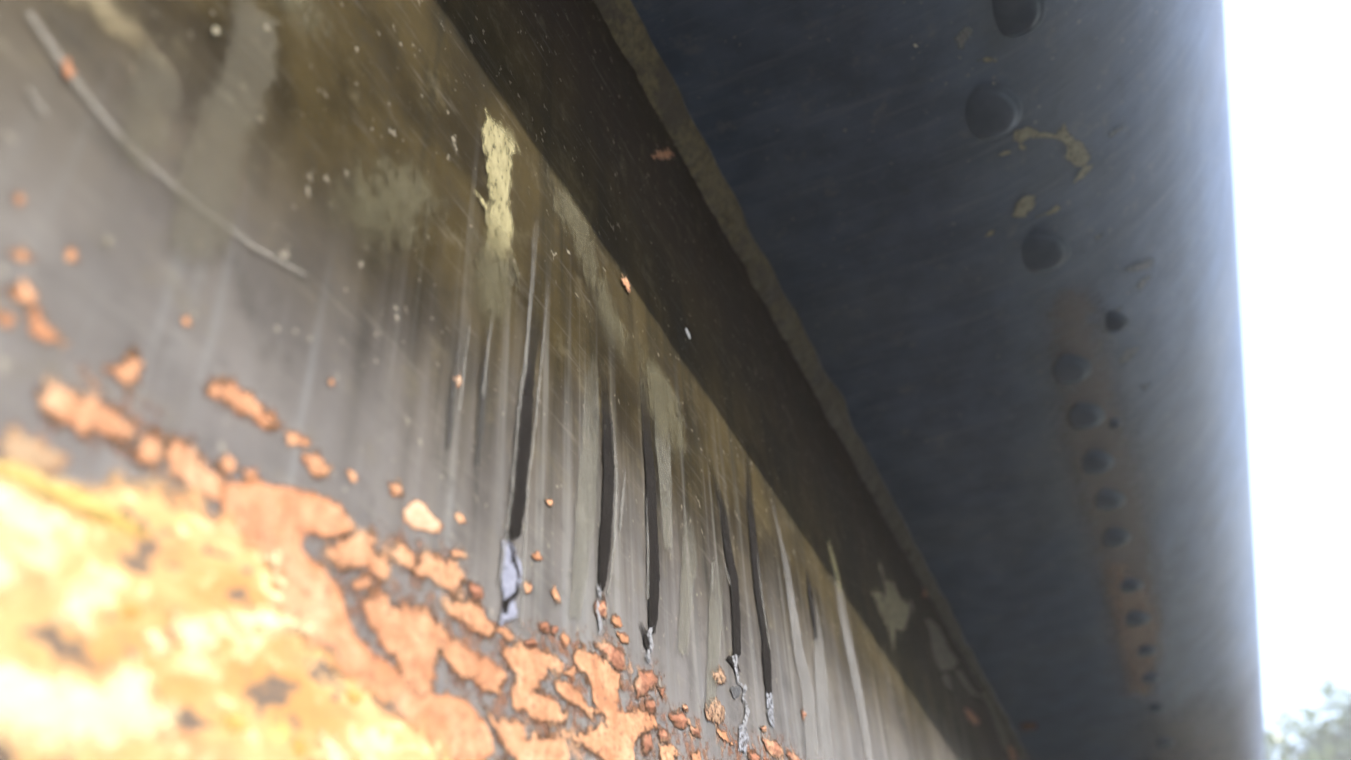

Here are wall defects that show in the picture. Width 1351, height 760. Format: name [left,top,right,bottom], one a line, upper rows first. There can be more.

rust [0,245,69,348]
rust [65,245,79,263]
peeling [0,461,451,760]
peeling [201,373,359,483]
peeling [388,477,467,534]
leakage [499,343,537,627]
leakage [596,394,615,634]
leakage [640,404,660,664]
leakage [716,477,774,753]
leakage [827,539,841,588]